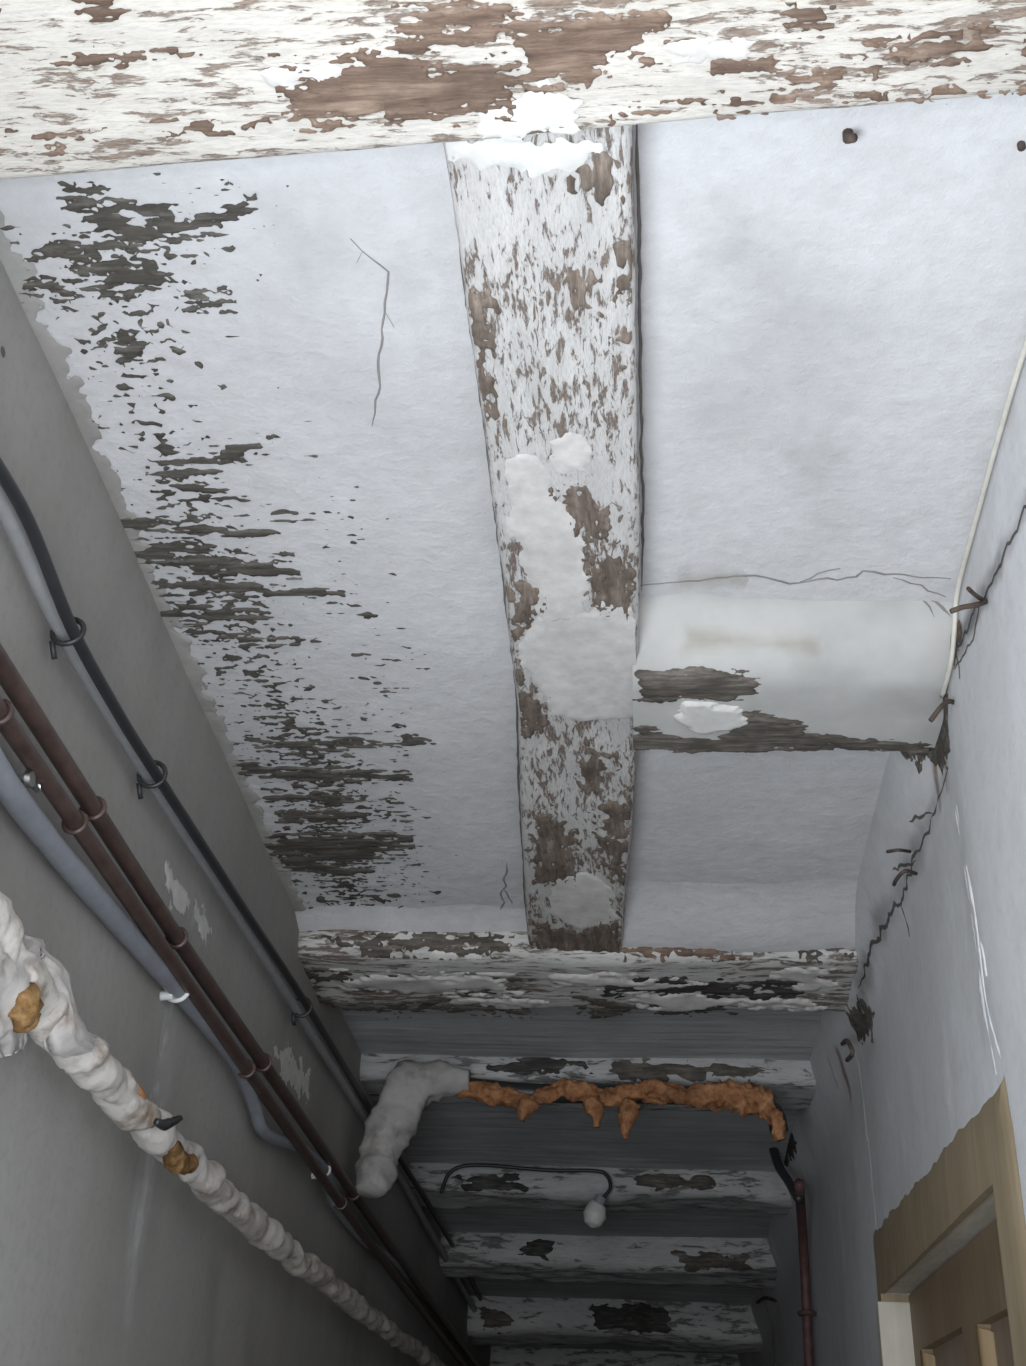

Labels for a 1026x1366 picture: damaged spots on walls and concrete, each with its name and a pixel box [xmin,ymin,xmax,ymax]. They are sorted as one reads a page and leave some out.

peeling [71,0,131,23]
peeling [50,45,203,70]
peeling [149,0,1026,142]
peeling [566,151,625,206]
crack [350,238,394,425]
peeling [467,288,501,421]
peeling [561,234,633,370]
peeling [53,218,440,906]
peeling [548,483,637,620]
flaking render [524,666,950,886]
crack [858,768,948,988]
peeling [313,910,875,1045]